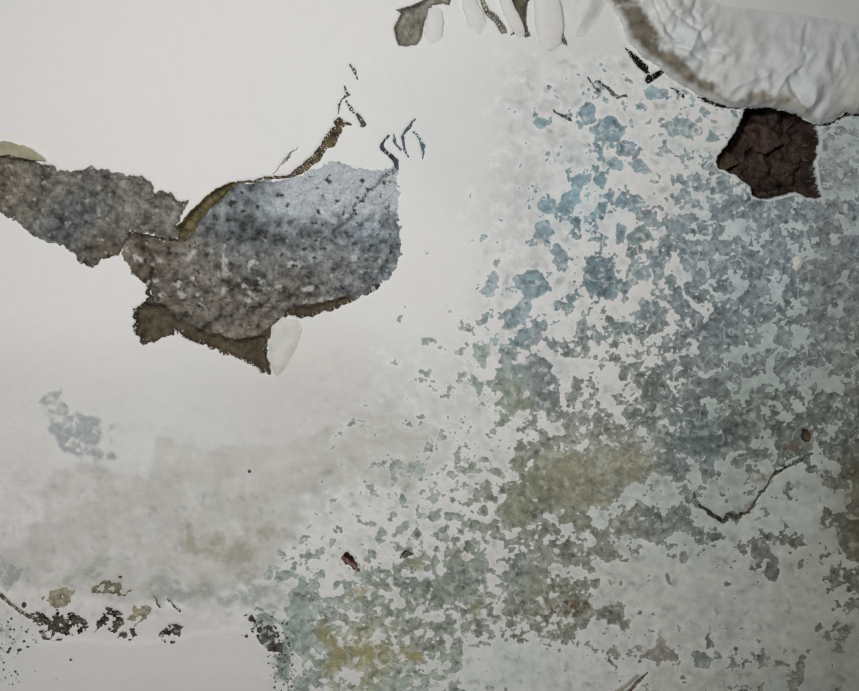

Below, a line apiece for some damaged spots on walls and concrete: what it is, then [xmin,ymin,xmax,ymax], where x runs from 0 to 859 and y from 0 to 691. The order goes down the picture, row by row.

flaking render [0,141,403,377]
peeling [242,63,859,691]
crack [693,453,813,524]
mould [0,601,37,685]
flaking render [30,587,152,641]
flaking render [92,580,132,596]
flaking render [158,624,183,644]